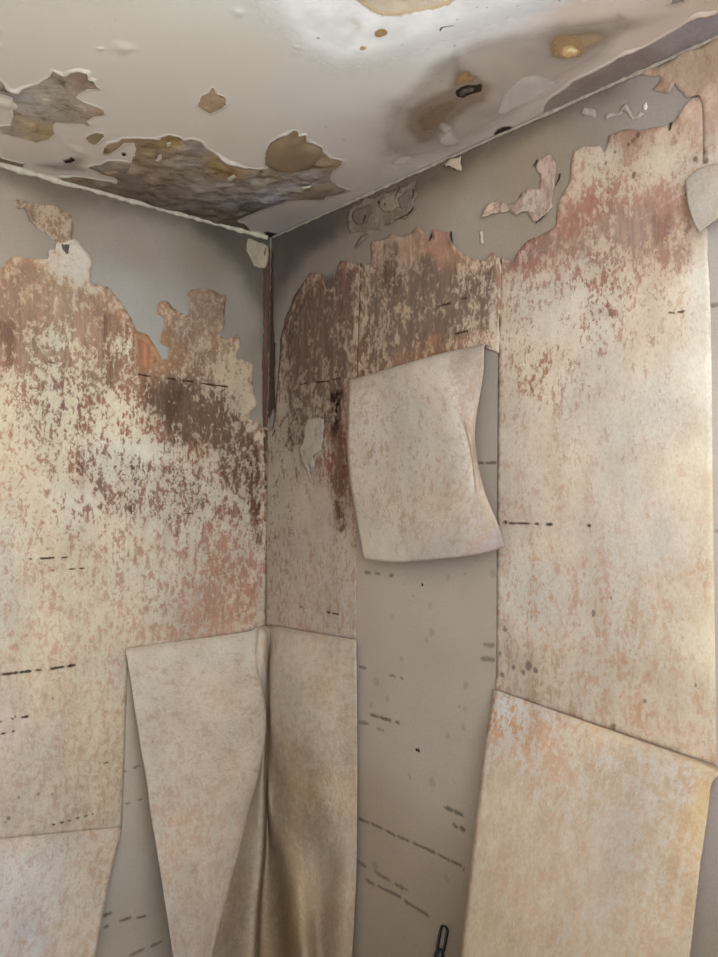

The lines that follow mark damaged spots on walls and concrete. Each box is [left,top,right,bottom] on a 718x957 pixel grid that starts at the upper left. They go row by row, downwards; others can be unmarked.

spalling [0,68,353,268]
damp [205,0,616,316]
peeling [442,156,462,171]